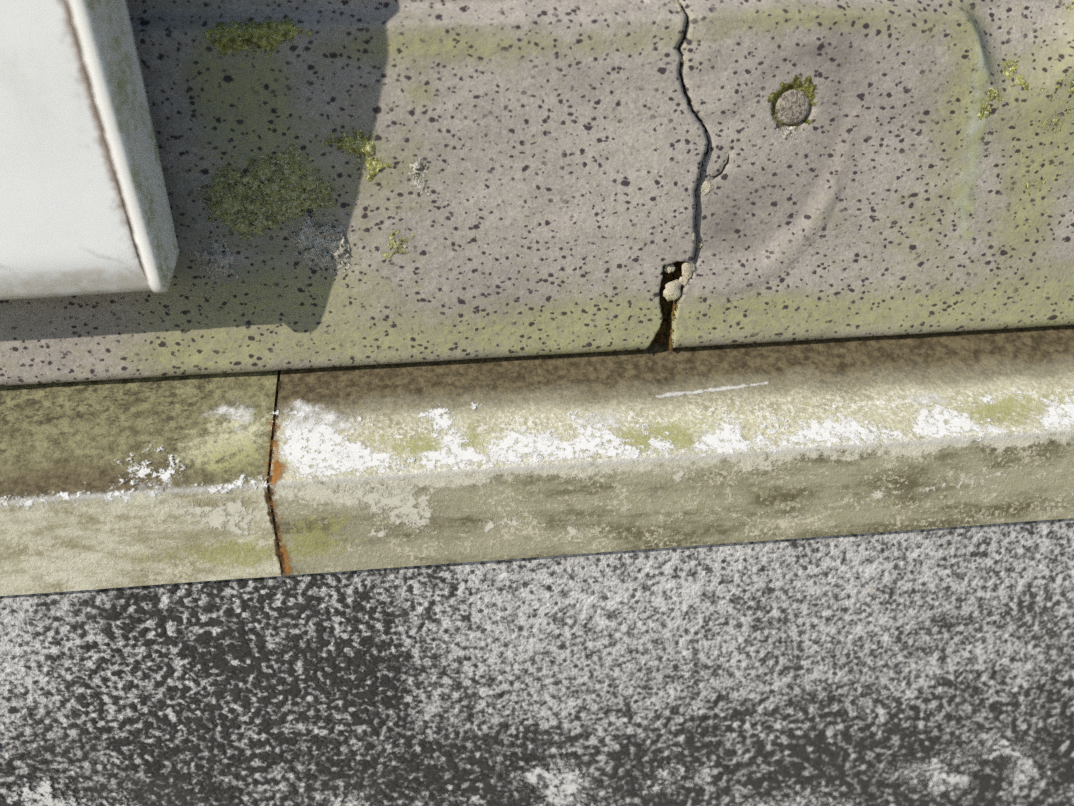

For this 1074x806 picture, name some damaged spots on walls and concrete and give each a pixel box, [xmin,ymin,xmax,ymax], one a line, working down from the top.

crack [674,0,729,259]
rust [264,382,292,575]
damp [656,382,768,398]